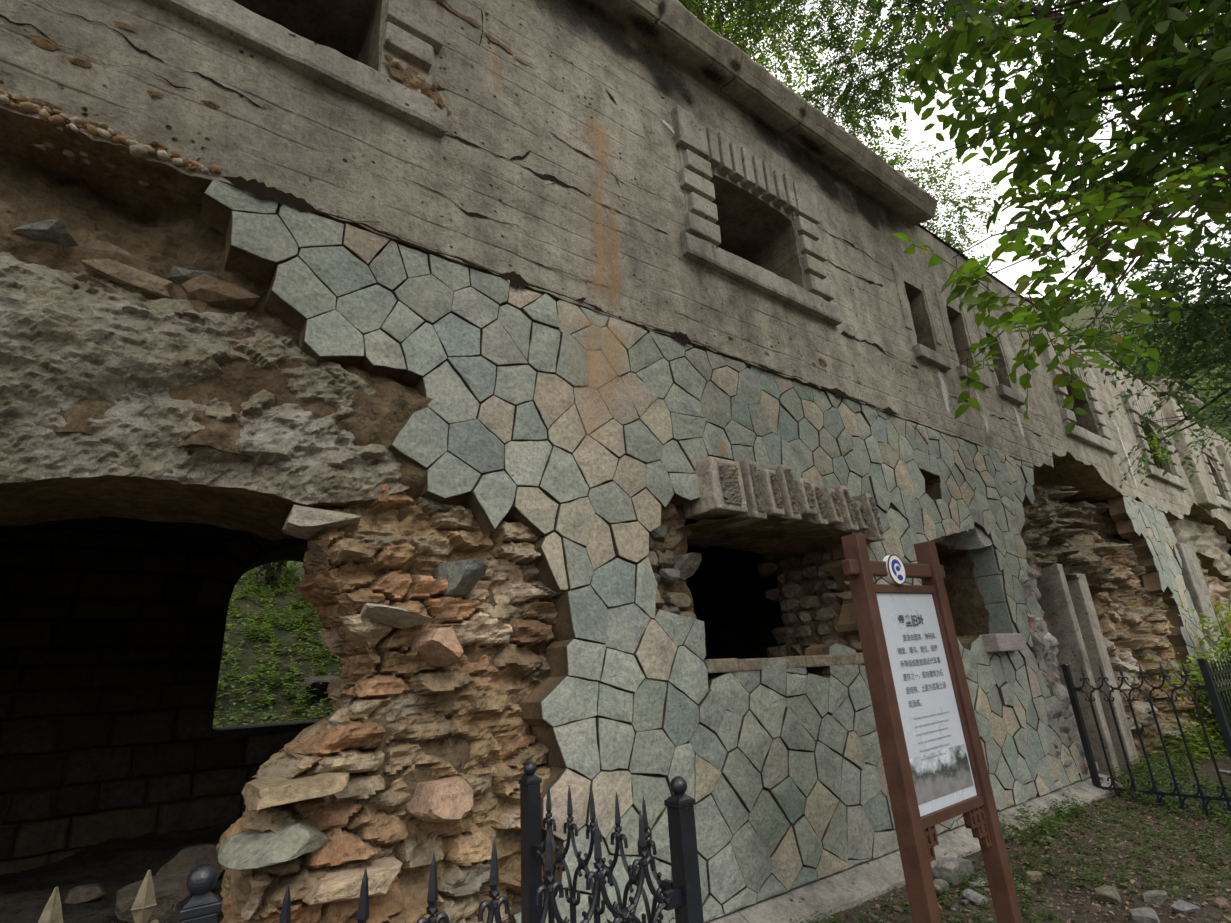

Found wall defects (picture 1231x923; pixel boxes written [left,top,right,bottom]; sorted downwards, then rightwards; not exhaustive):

crack [0,1,268,109]
spalling [1168,517,1231,583]
spalling [1020,480,1132,787]